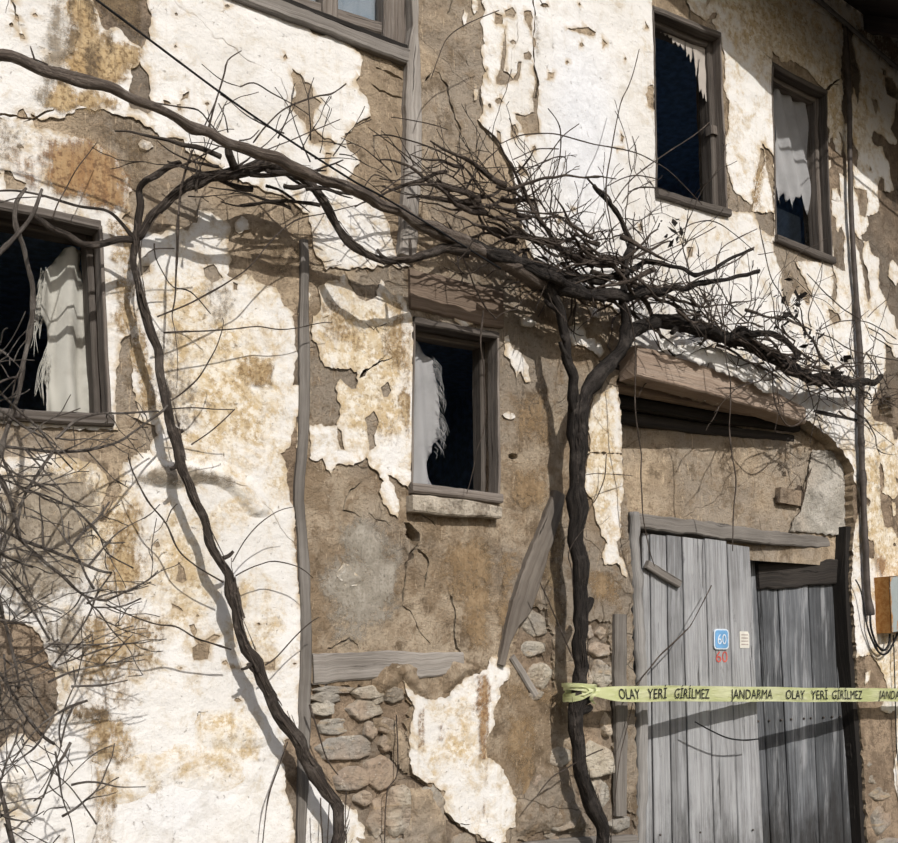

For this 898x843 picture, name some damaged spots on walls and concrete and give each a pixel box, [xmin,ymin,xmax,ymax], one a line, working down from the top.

flaking render [93,0,151,47]
flaking render [418,0,554,260]
flaking render [726,145,821,305]
flaking render [828,103,898,329]
damp [137,463,235,486]
flaking render [0,47,621,843]
crack [404,547,428,578]
flaking render [852,464,898,546]
flaking render [871,346,898,440]
damp [0,467,167,842]
flaking render [583,489,639,836]
flaking render [858,701,898,843]